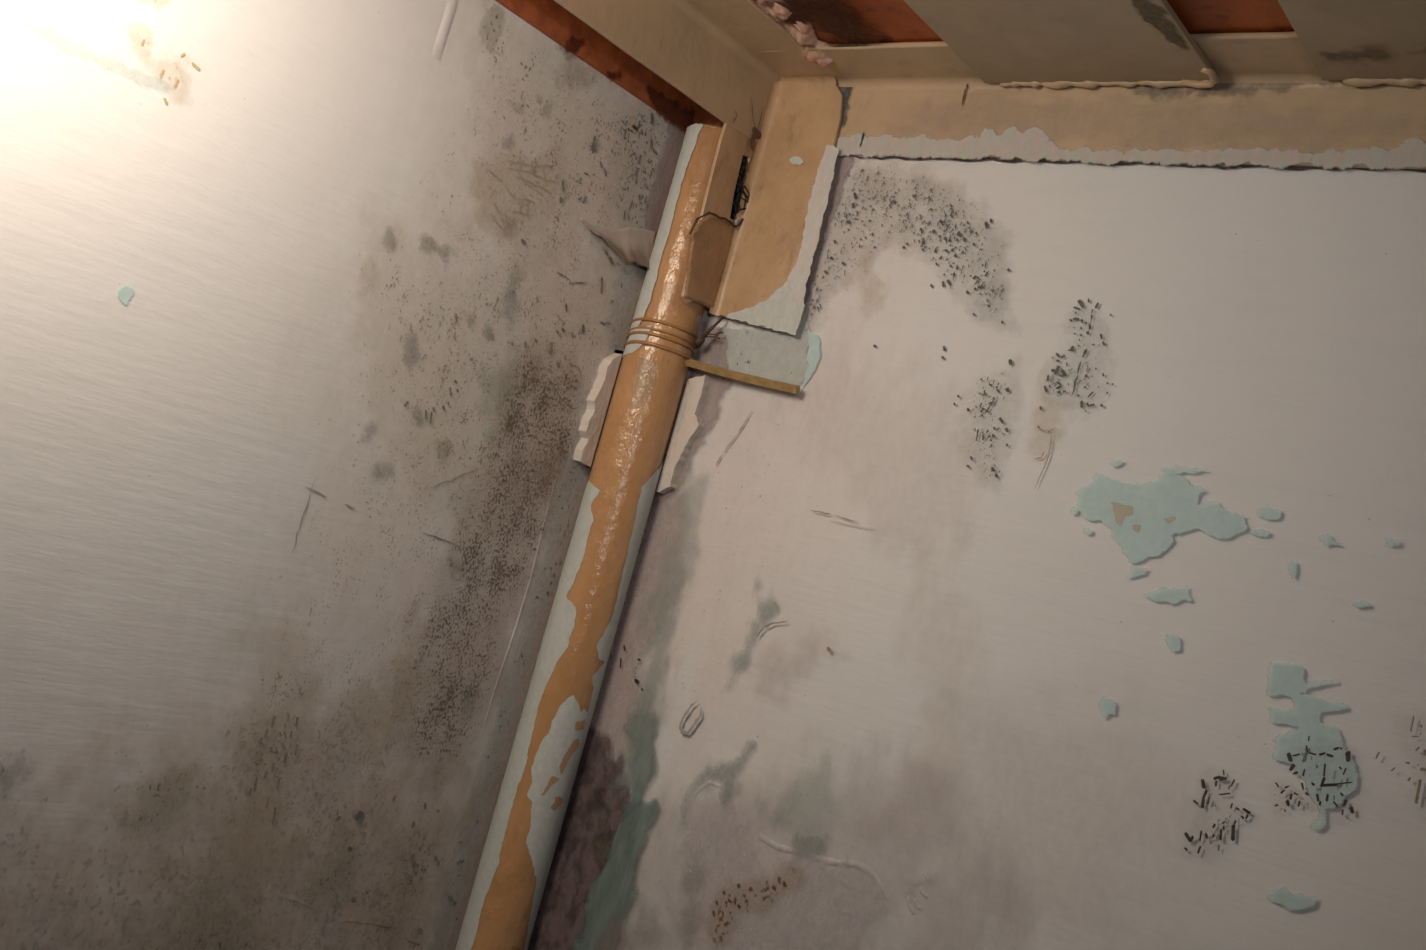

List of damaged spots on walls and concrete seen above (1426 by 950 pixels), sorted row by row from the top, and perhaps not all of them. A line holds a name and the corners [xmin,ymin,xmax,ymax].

leakage [483,8,668,250]
peeling [804,156,853,303]
leakage [800,158,1010,324]
peeling [653,321,820,505]
leakage [953,359,1012,481]
leakage [1037,298,1113,432]
leakage [380,231,624,935]
peeling [1071,460,1281,578]
leakage [528,495,681,950]
leakage [1184,770,1251,854]
peeling [1267,663,1357,831]
leakage [1391,716,1426,804]